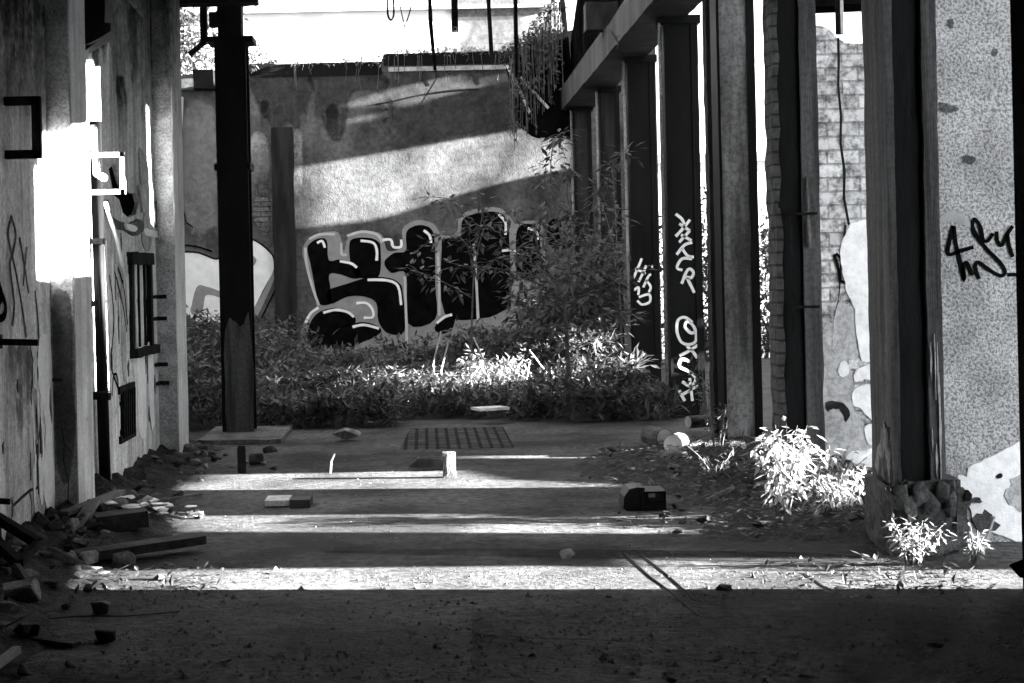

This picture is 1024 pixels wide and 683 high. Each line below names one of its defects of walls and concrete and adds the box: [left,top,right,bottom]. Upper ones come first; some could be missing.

flaking render [930,334,942,479]
flaking render [957,441,1022,544]